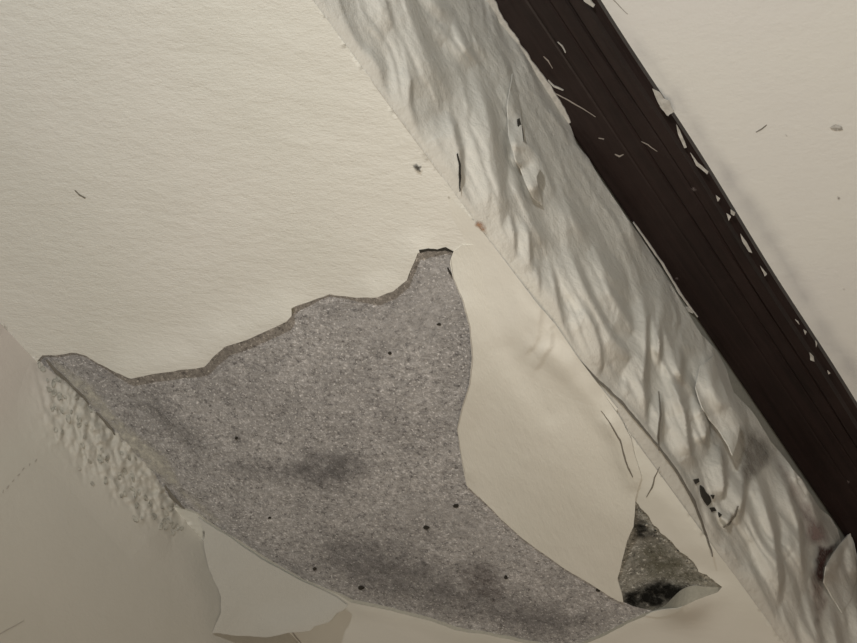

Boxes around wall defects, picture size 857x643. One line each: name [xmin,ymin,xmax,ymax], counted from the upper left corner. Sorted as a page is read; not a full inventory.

spalling [18,244,722,643]
peeling [695,356,740,455]